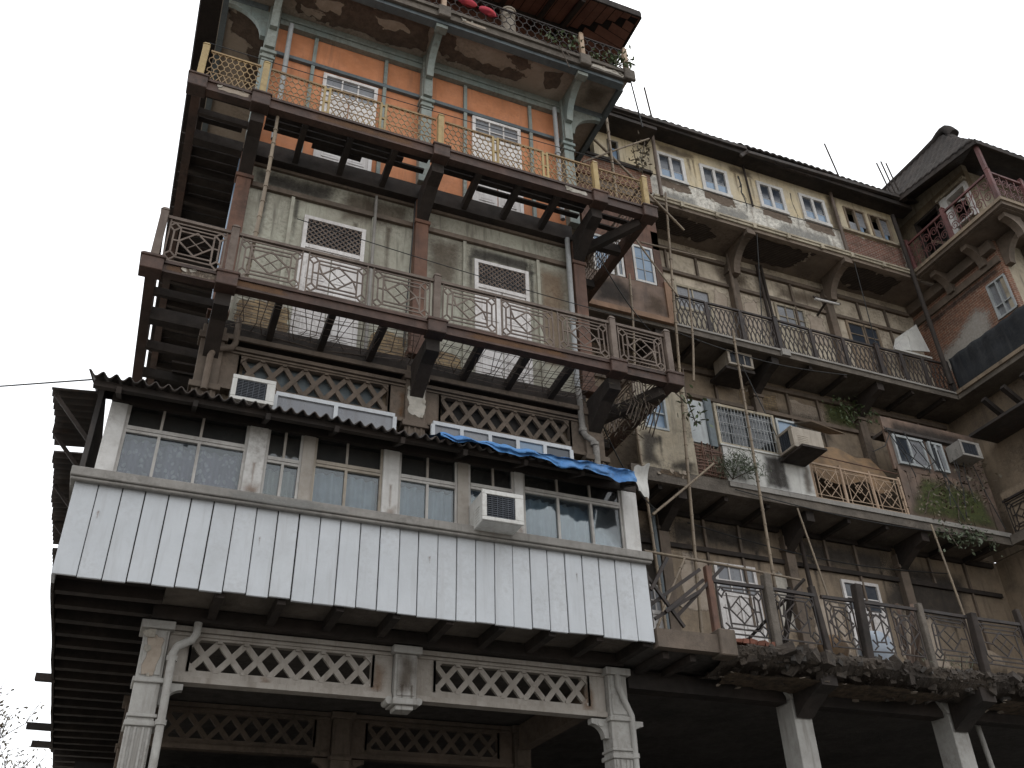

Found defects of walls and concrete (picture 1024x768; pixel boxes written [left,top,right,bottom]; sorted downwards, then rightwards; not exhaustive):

peeling [295,0,533,81]
peeling [543,72,563,89]
water stain [827,198,839,230]
peeling [407,386,426,418]